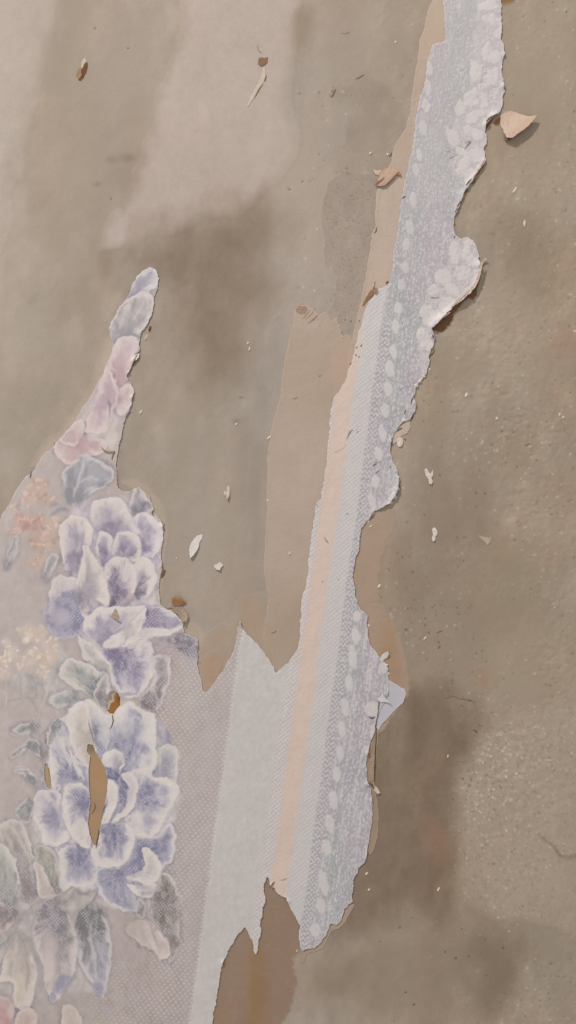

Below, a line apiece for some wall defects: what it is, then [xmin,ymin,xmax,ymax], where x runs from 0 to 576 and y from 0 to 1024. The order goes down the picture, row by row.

damp [88,0,321,693]
peeling [167,596,188,623]
peeling [189,534,202,559]
damp [322,658,540,1024]